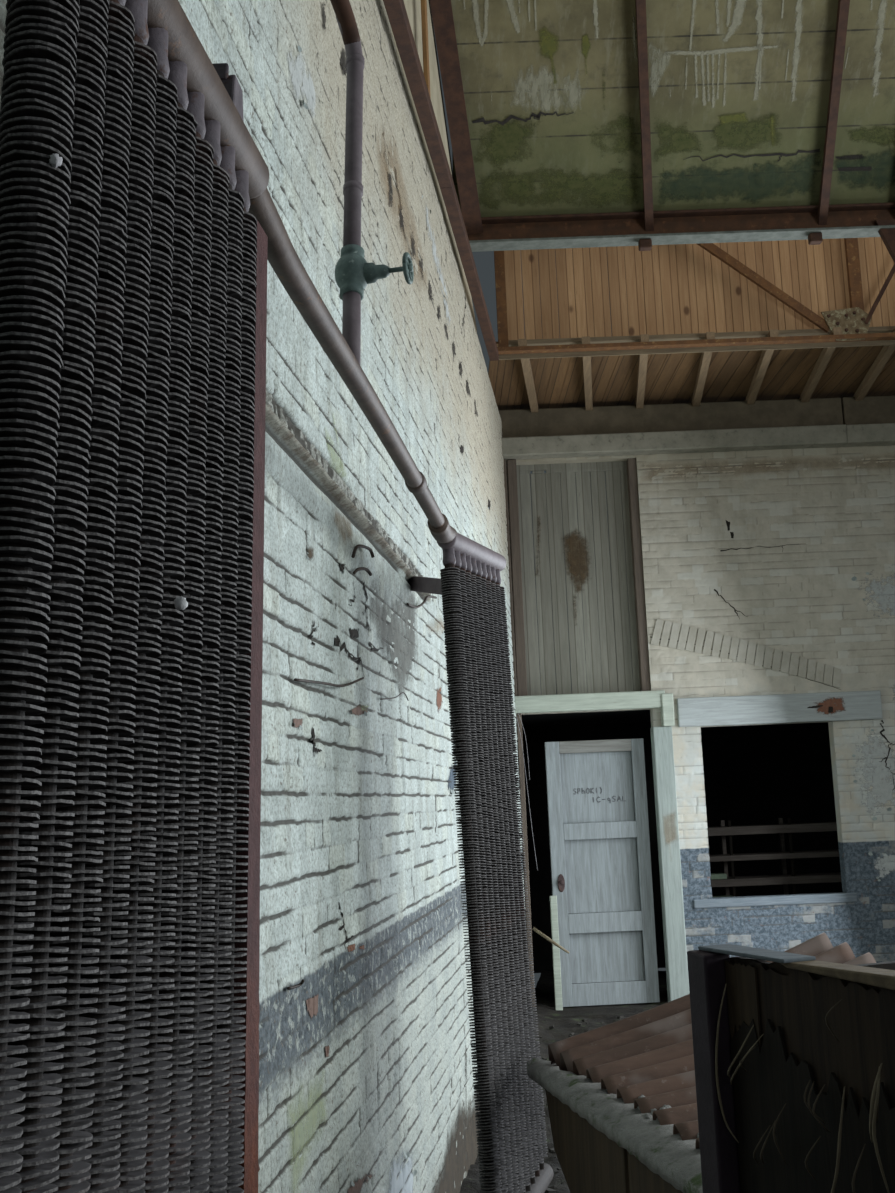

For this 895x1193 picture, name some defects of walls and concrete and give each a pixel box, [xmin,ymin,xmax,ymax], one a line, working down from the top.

leakage [463,0,489,46]
leakage [665,0,802,108]
leakage [870,0,887,97]
crack [472,111,574,125]
crack [683,149,820,162]
leakage [563,531,589,618]
corrosion [807,698,845,715]
crack [879,720,895,791]
peeling [868,851,895,881]